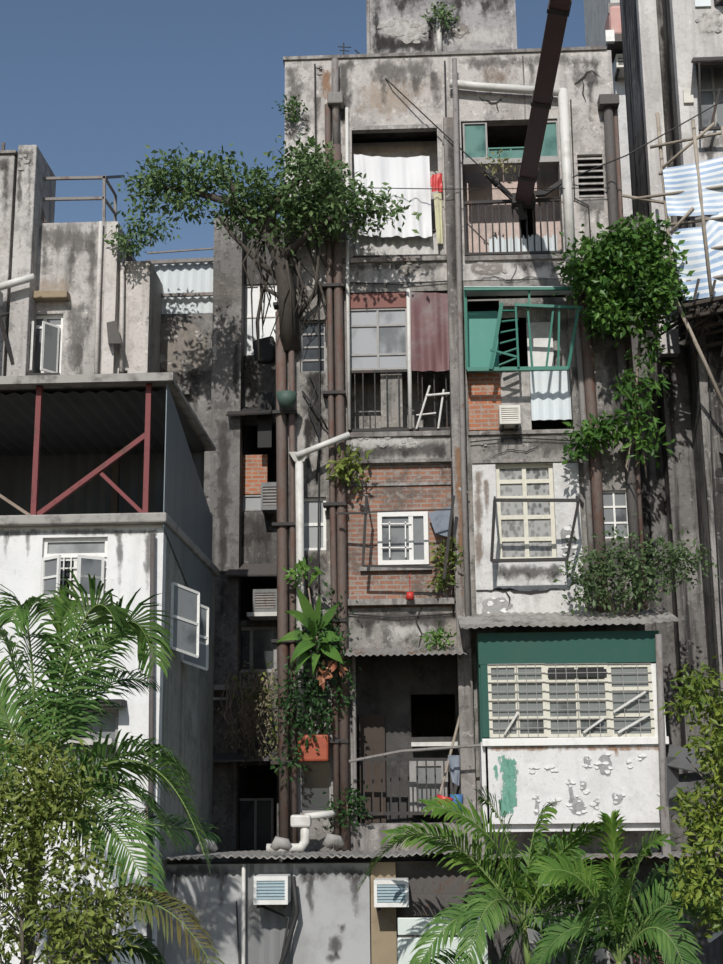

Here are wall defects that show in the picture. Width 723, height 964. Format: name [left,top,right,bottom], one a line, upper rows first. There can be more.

leakage [287,68,321,139]
leakage [339,60,353,122]
spalling [160,316,221,378]
leakage [52,529,156,571]
peeling [482,597,513,614]
crack [476,587,557,604]
peeling [582,752,613,776]
peeling [493,755,519,817]
peeling [532,780,600,815]
leakage [300,869,325,907]
leakage [337,870,363,892]
leakage [329,926,344,959]